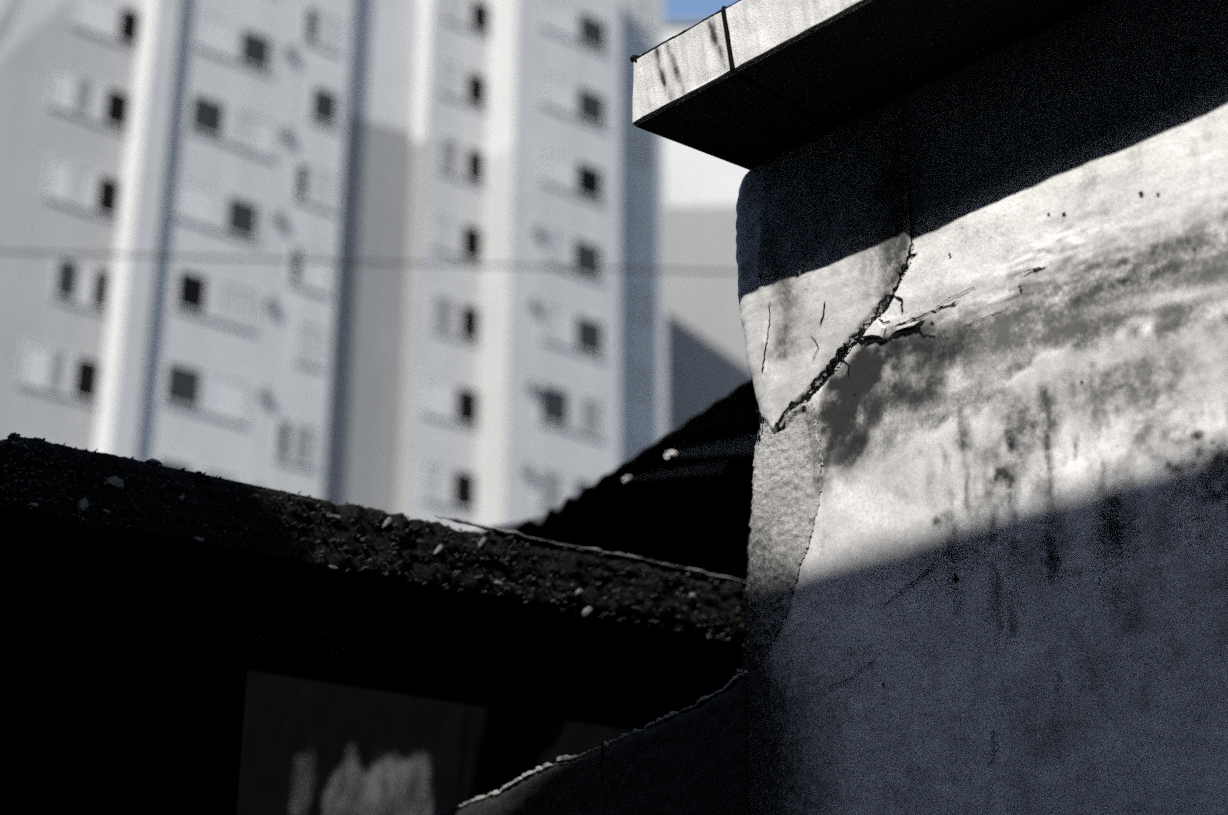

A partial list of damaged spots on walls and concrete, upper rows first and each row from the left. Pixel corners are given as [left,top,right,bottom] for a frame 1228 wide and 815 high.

water stain [755,231,792,390]
crack [755,175,1006,442]
water stain [879,150,907,299]
water stain [814,231,1228,562]